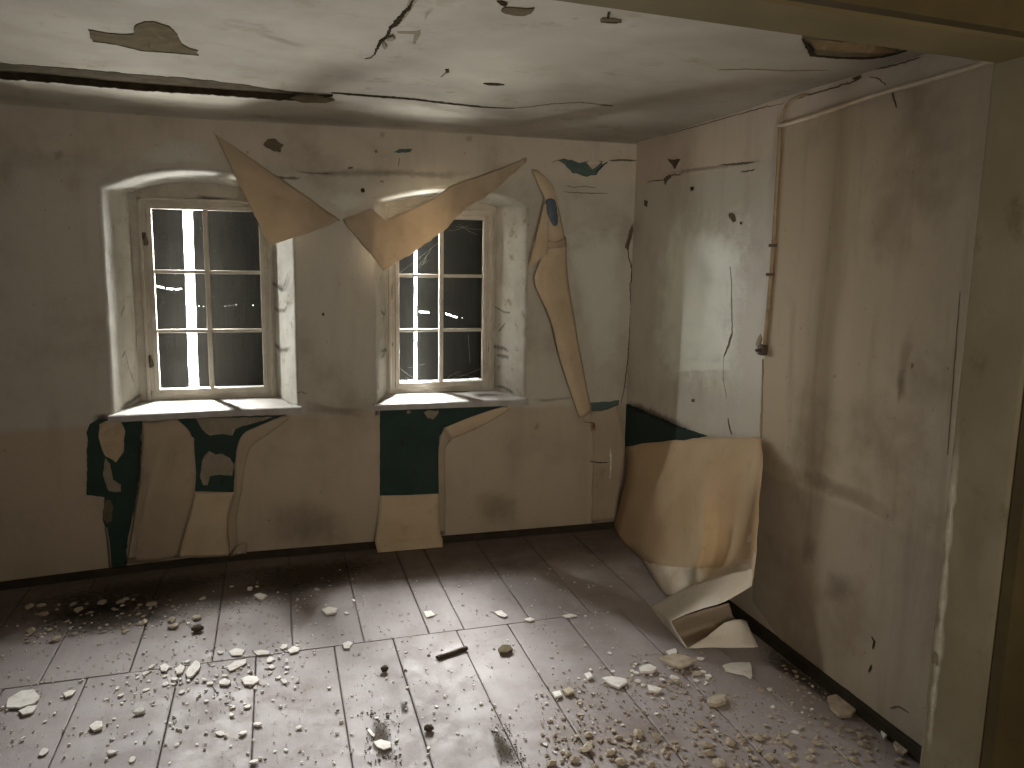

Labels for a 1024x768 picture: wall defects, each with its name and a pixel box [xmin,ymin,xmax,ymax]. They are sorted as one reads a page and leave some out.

spalling [88,21,198,56]
crack [365,0,421,59]
spalling [802,35,908,60]
crack [0,62,613,109]
spalling [263,138,284,152]
spalling [552,159,608,177]
crack [722,162,755,172]
crack [621,224,633,402]
crack [723,267,733,393]
peeling [86,415,290,568]
peeling [375,406,503,553]
peeling [591,400,707,523]